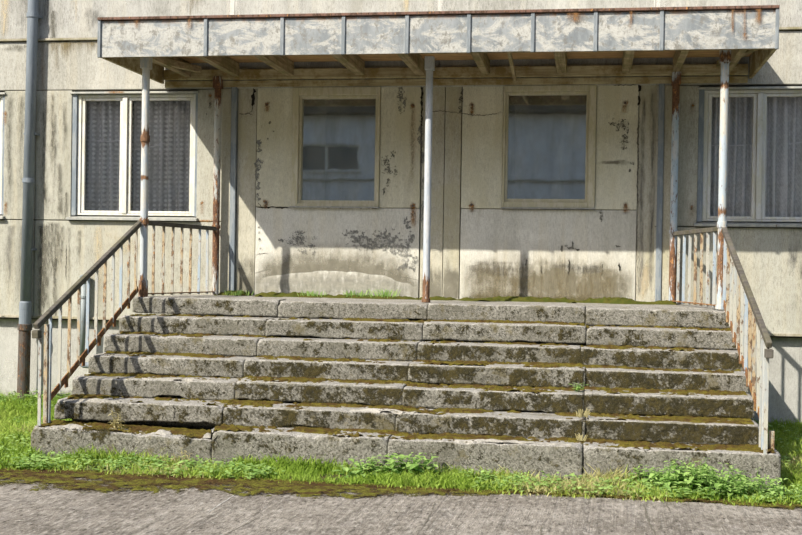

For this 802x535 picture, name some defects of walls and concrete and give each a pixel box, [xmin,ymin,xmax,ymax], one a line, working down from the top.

crack [239,88,256,115]
crack [420,87,497,160]
peeling [278,230,317,256]
peeling [342,201,424,271]
water stain [39,224,80,314]
water stain [264,256,409,283]
water stain [472,262,626,301]